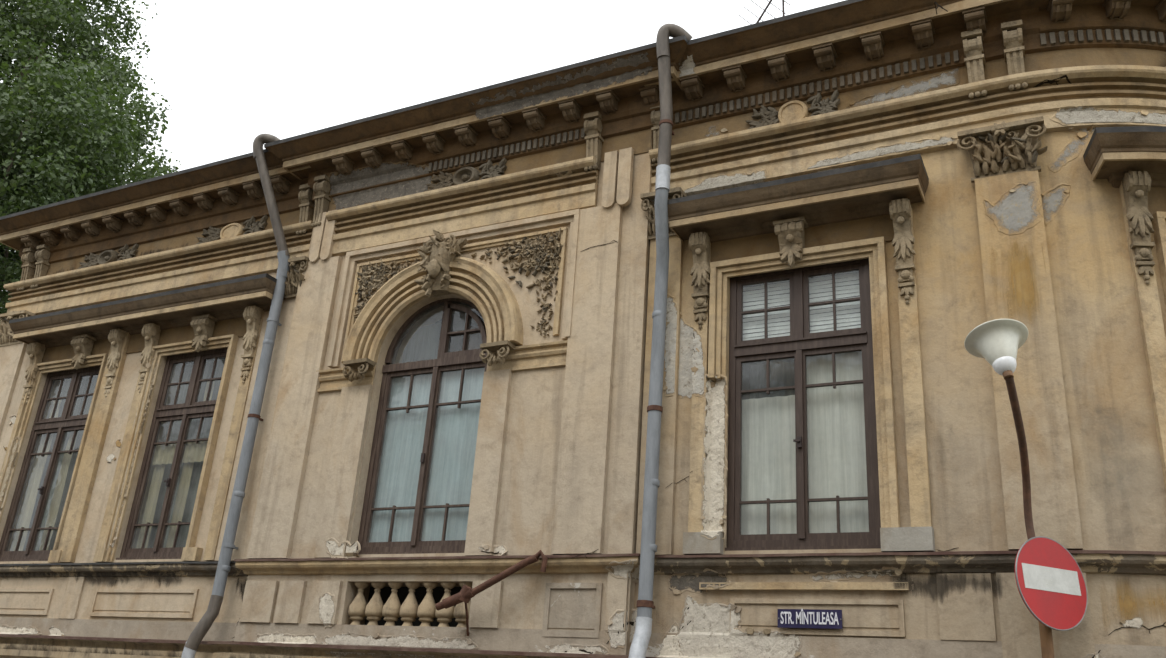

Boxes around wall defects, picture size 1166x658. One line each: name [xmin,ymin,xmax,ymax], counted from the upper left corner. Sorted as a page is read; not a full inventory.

flaking render [984,105,1166,235]
flaking render [663,293,729,540]
flaking render [254,592,478,658]
flaking render [545,607,637,654]
flaking render [656,568,802,658]
crack [1109,622,1166,635]